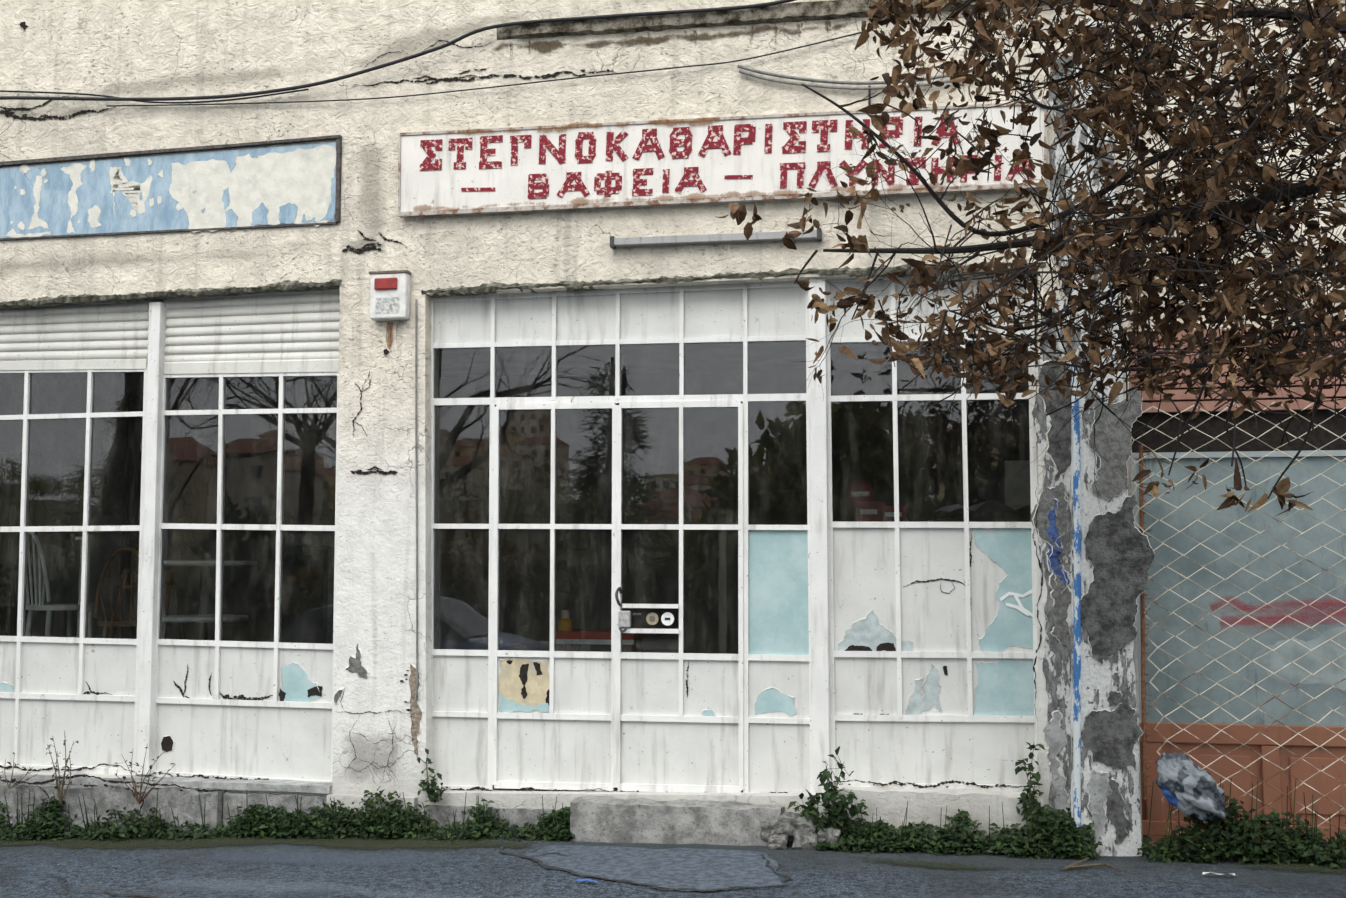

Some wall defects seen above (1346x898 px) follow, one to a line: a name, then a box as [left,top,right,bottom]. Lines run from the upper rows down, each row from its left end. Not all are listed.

crack [355,40,614,86]
peeling [973,55,1155,845]
peeling [279,661,345,705]
peeling [345,644,370,679]
crack [331,688,402,783]
peeling [400,663,422,759]